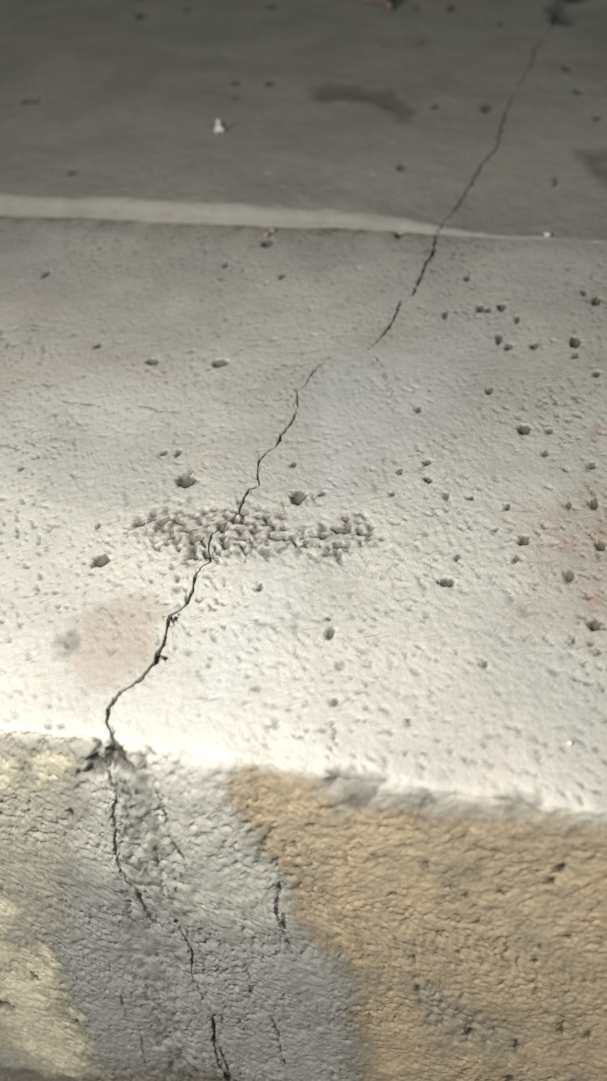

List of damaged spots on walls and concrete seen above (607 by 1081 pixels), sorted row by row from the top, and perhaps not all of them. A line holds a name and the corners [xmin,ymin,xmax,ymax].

crack [368,0,573,395]
crack [106,366,318,932]
crack [213,967,253,1081]
crack [275,859,291,953]